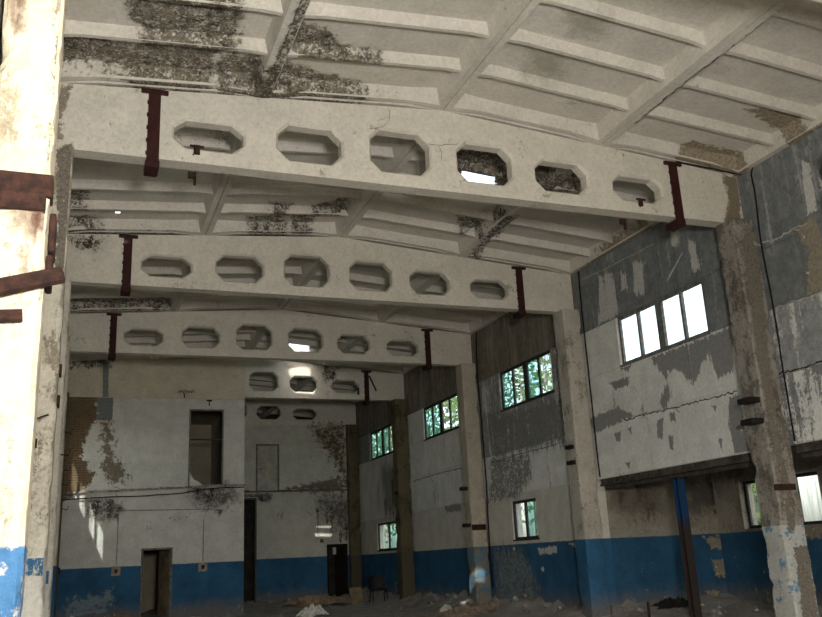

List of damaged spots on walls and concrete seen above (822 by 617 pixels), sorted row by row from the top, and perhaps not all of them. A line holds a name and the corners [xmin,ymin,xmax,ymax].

crack [635,23,762,124]
spalling [675,140,749,221]
crack [779,360,822,375]
flaking render [63,397,133,501]
flaking render [283,419,347,496]
peeling [538,545,557,555]
spalling [793,525,822,617]